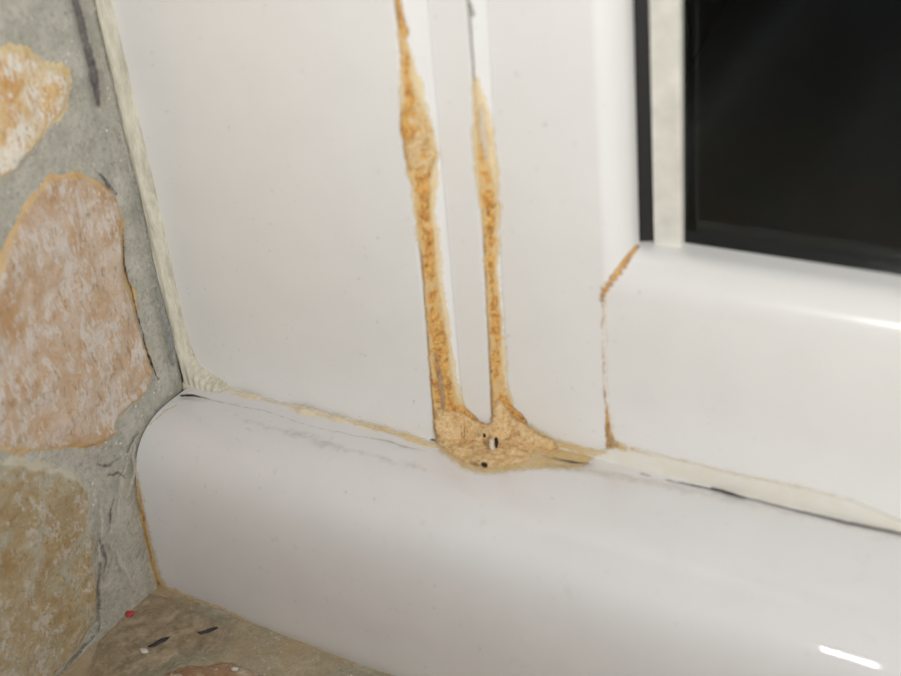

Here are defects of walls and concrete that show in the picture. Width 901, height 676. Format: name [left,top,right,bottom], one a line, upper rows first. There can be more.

corrosion [394,0,591,472]
corrosion [600,245,640,302]
corrosion [604,390,625,451]